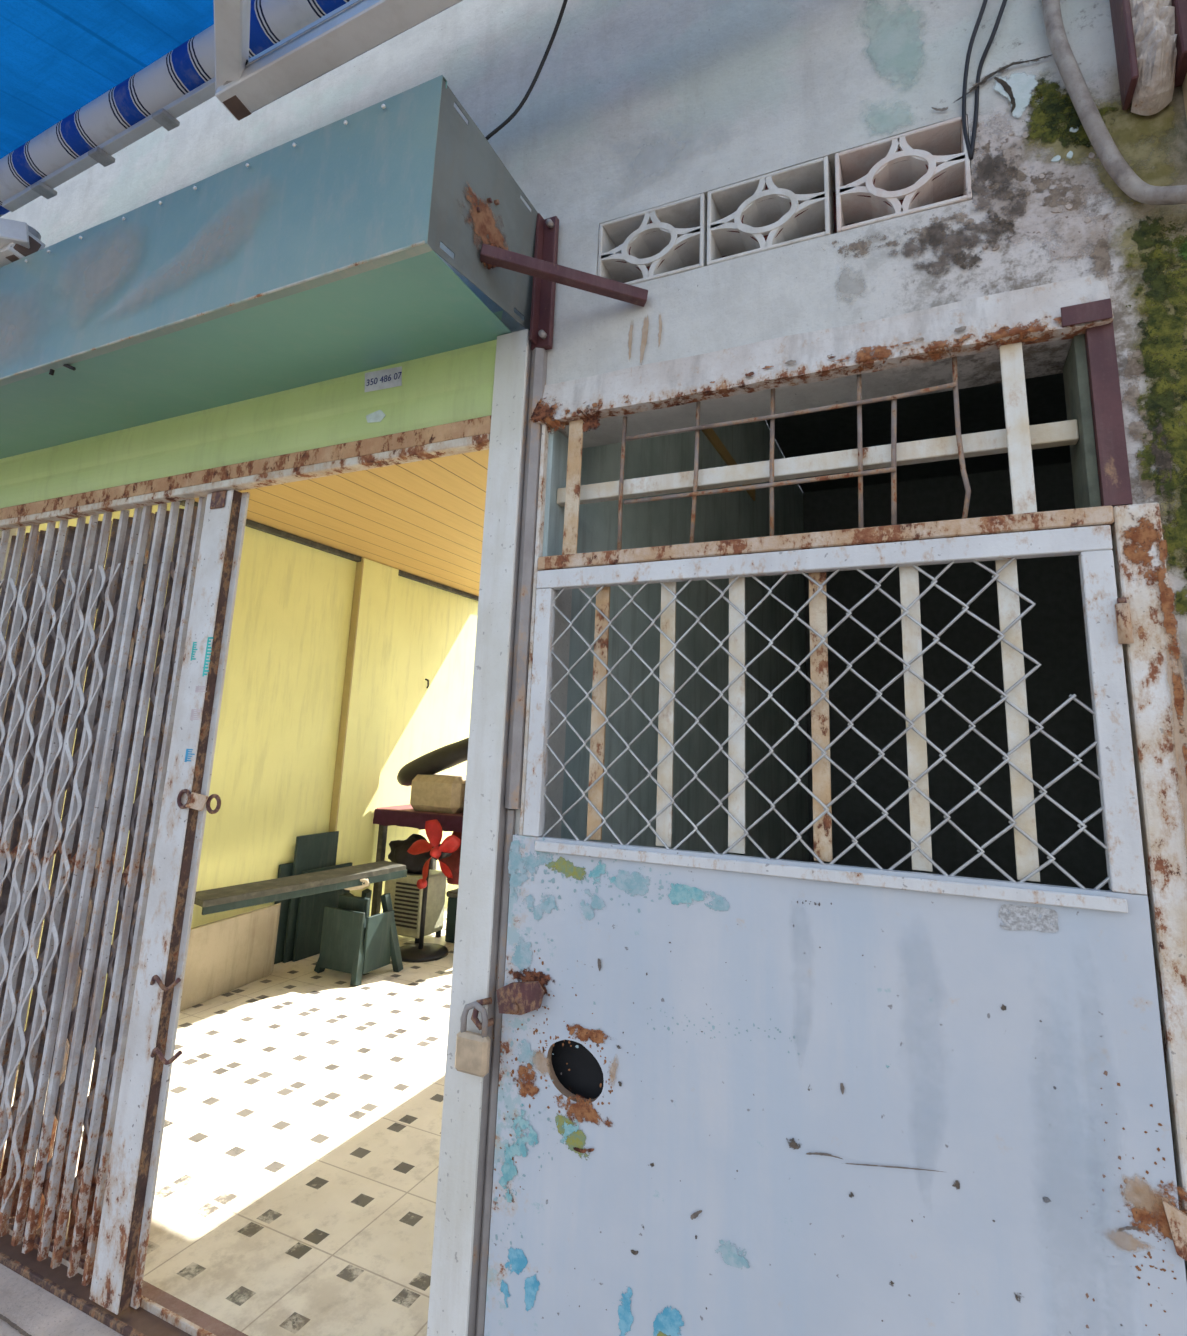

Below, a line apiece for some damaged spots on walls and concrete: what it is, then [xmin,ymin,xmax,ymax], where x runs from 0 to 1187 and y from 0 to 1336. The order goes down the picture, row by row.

flaking render [971,72,1121,260]
water stain [832,144,1084,297]
rust [843,345,892,372]
rust [987,317,1073,349]
rust [530,398,601,434]
water stain [1122,350,1173,523]
rust [1122,513,1187,848]
peeling [508,840,650,921]
peeling [553,1114,590,1160]
rust [1109,1177,1187,1251]
peeling [618,1286,634,1336]
peeling [653,1306,684,1336]